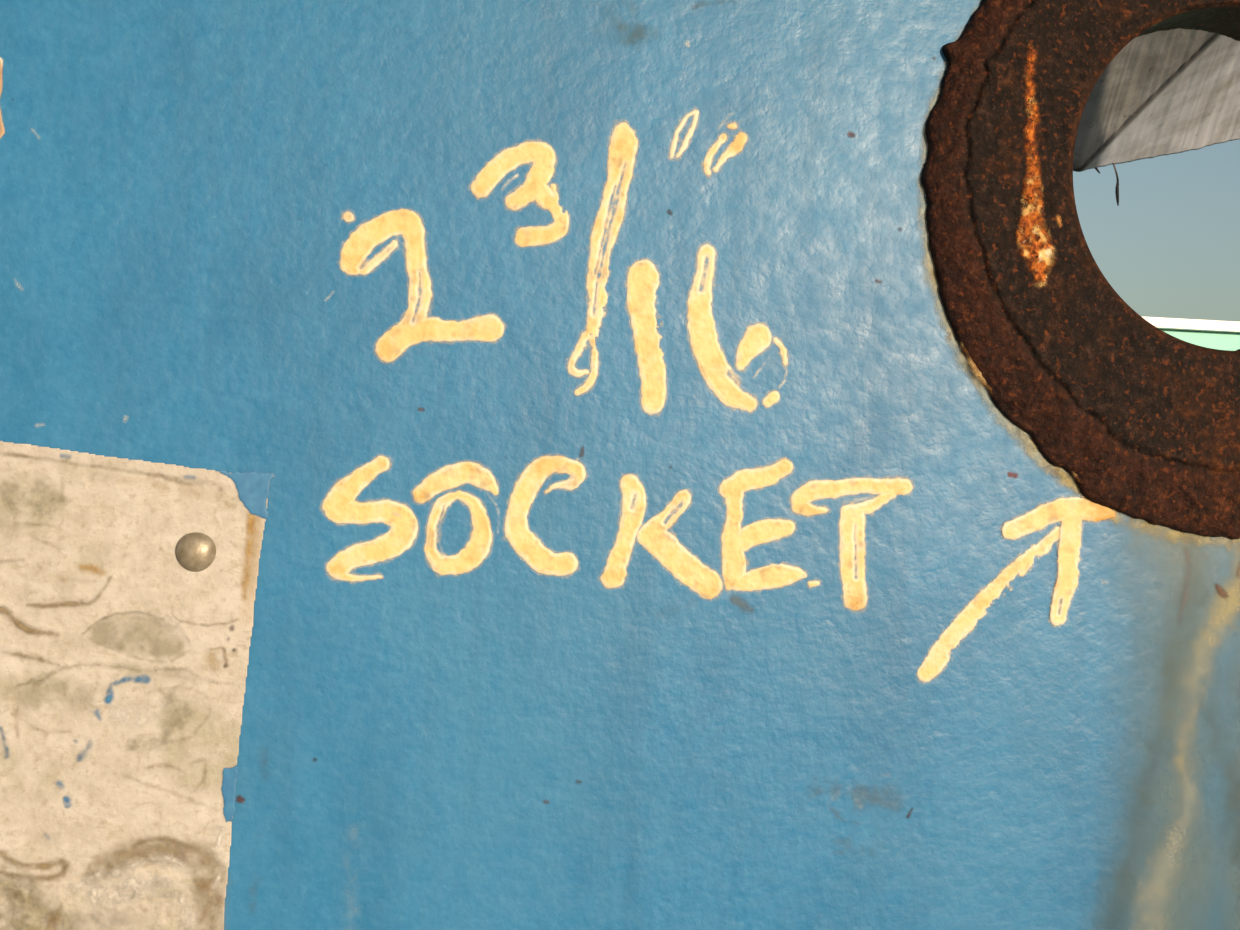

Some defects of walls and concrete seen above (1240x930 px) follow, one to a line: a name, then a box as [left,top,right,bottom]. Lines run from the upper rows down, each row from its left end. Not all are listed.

corrosion [1017,48,1053,285]
corrosion [970,359,992,389]
water stain [1130,529,1240,930]